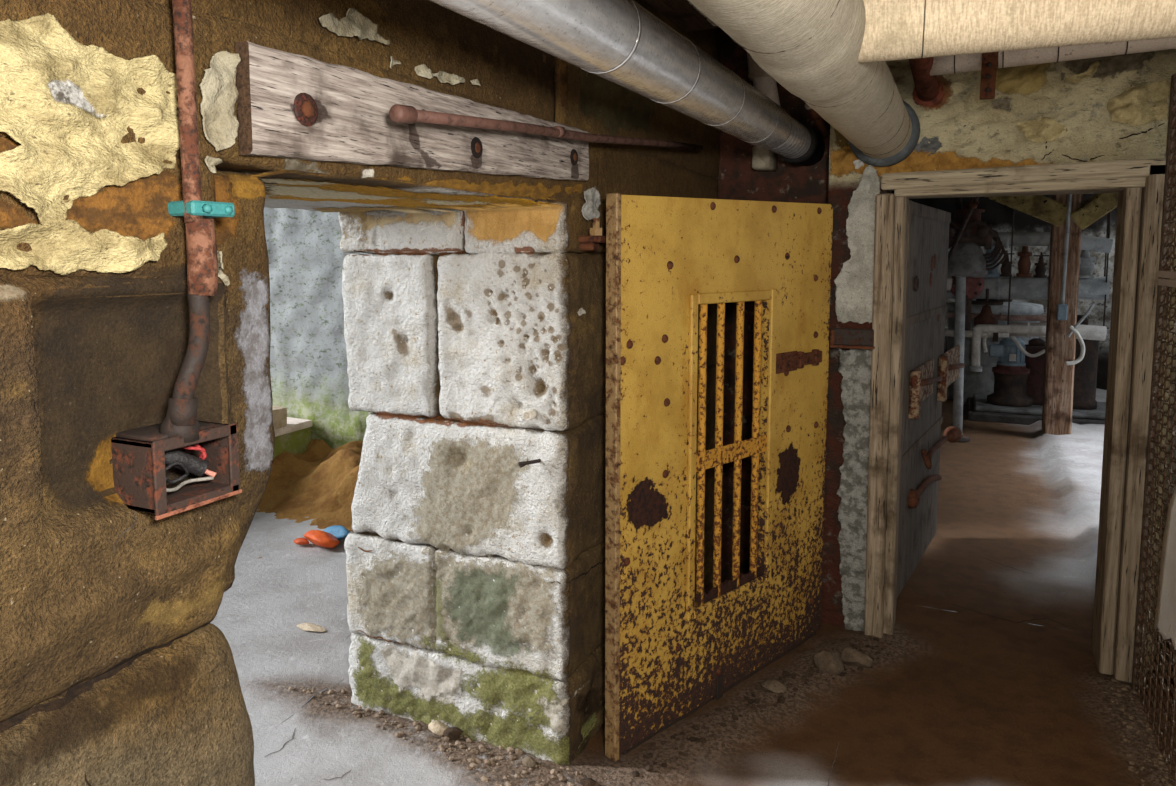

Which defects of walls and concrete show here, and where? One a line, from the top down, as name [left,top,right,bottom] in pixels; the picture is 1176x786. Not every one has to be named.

peeling [319,8,481,86]
corrosion [912,75,953,110]
spalling [992,51,1154,111]
peeling [0,13,183,275]
peeling [199,51,601,220]
spalling [914,137,942,156]
corrosion [775,442,801,505]
corrosion [626,477,669,531]
corrosion [694,566,775,618]
crack [0,614,217,733]
leakage [537,685,584,733]